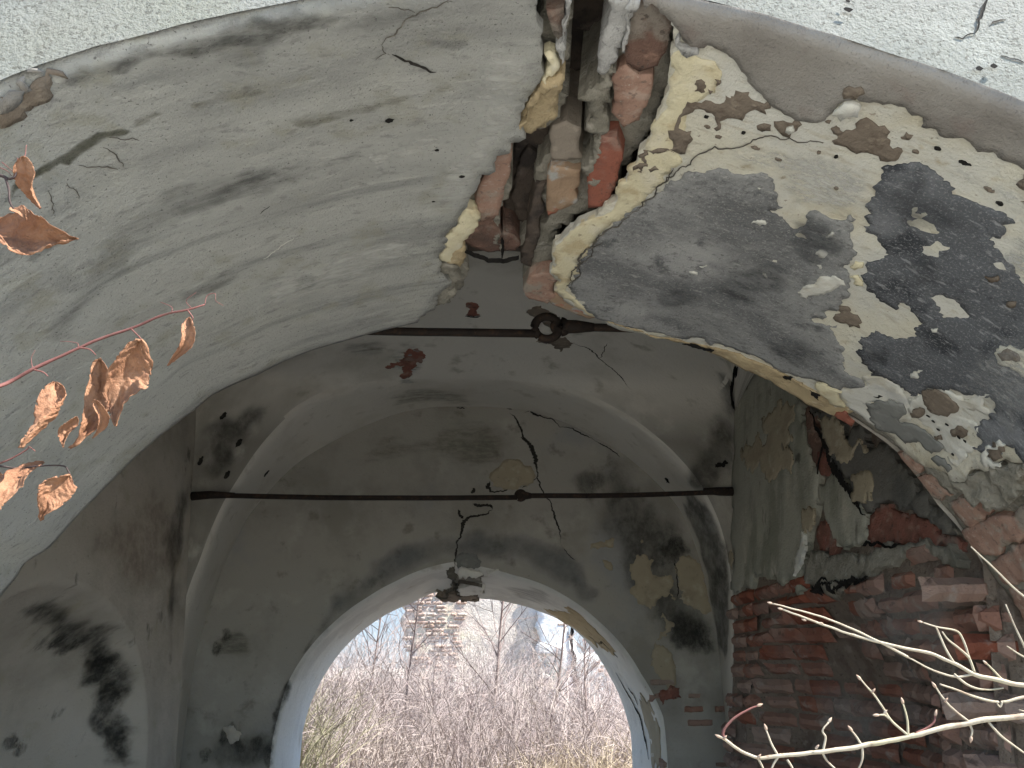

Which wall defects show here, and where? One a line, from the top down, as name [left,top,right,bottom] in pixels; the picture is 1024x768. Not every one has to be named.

peeling [0,68,68,129]
crack [48,137,139,214]
crack [376,1,452,60]
crack [567,135,823,288]
spalling [436,0,1024,328]
spalling [536,337,573,352]
water stain [30,606,127,761]
crack [454,408,618,563]
spalling [544,606,616,679]
water stain [612,500,685,569]
water stain [657,496,728,653]
flaking render [608,322,1024,768]